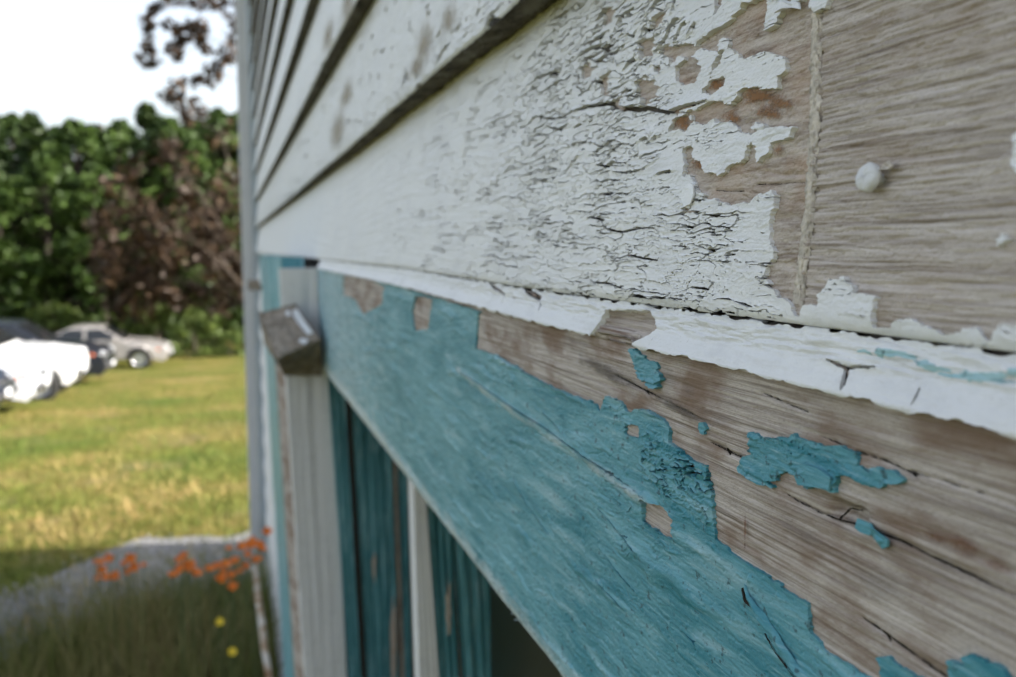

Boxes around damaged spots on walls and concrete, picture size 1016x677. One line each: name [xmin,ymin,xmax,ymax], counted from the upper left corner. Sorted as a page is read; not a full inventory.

peeling [532,0,1016,346]
peeling [344,274,386,314]
peeling [408,288,1016,677]
crack [822,436,1004,502]
crack [787,494,1013,595]
crack [864,617,947,677]